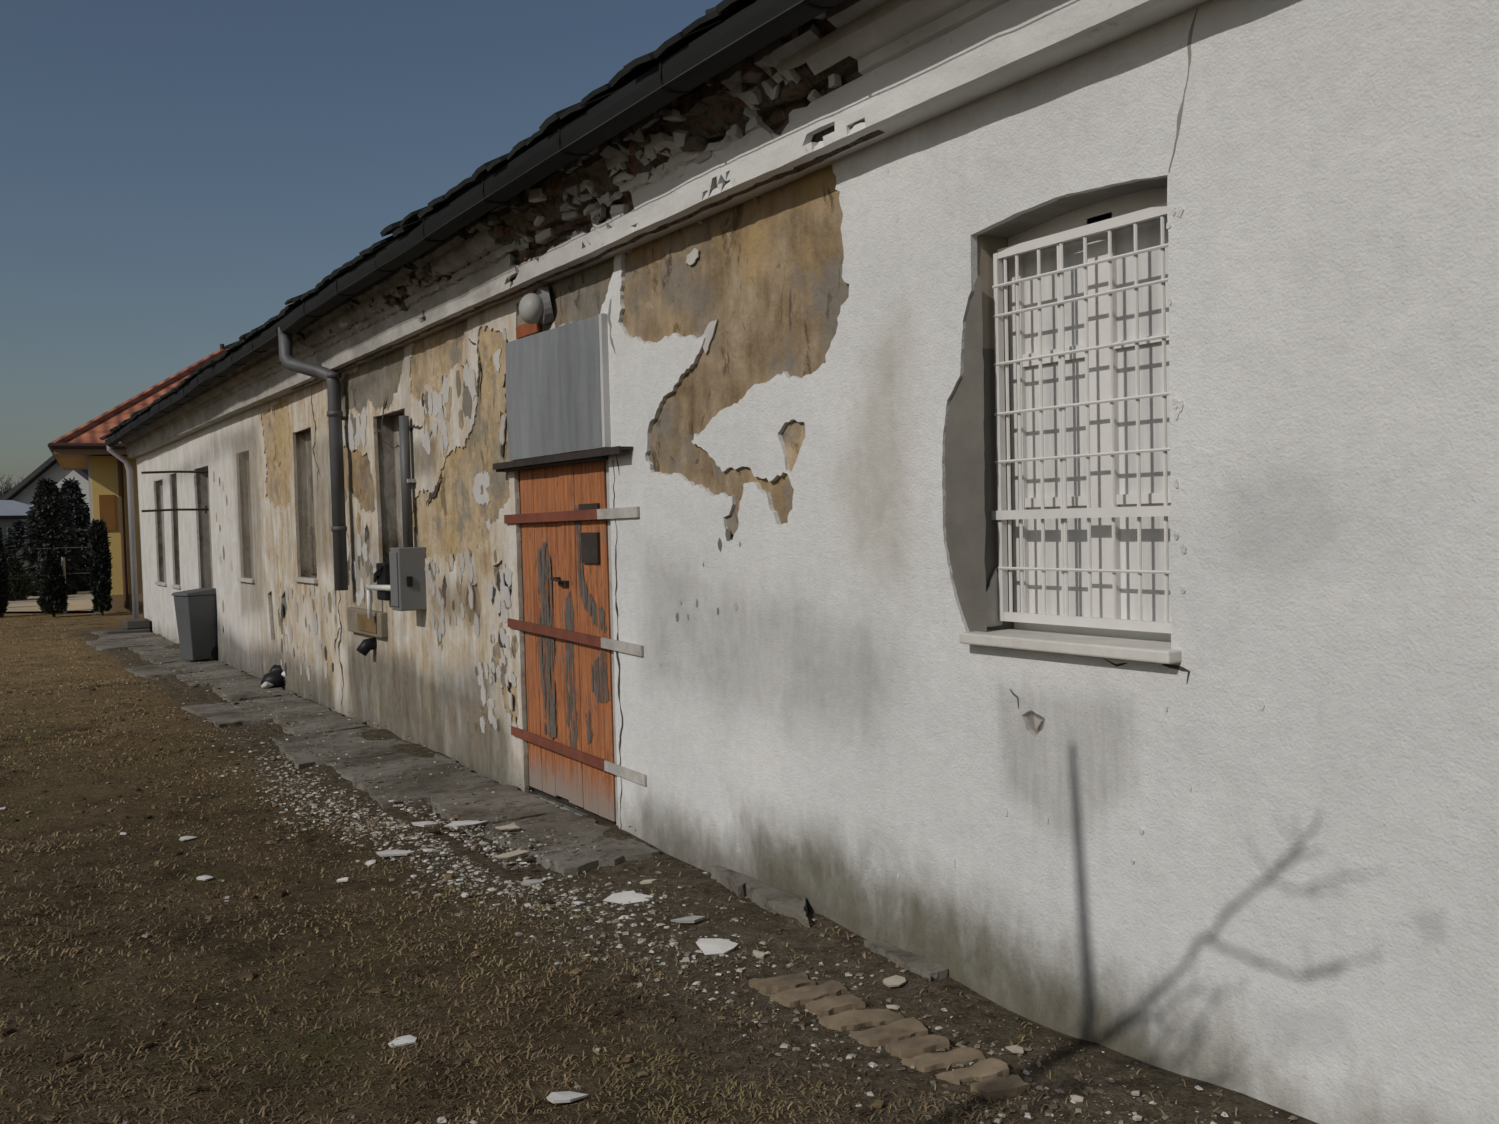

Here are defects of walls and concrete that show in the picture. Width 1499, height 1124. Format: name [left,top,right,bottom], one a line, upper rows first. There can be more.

spalling [629,108,743,164]
crack [1168,8,1198,172]
flaking render [262,399,292,510]
flaking render [271,165,849,749]
water stain [760,840,1159,1068]